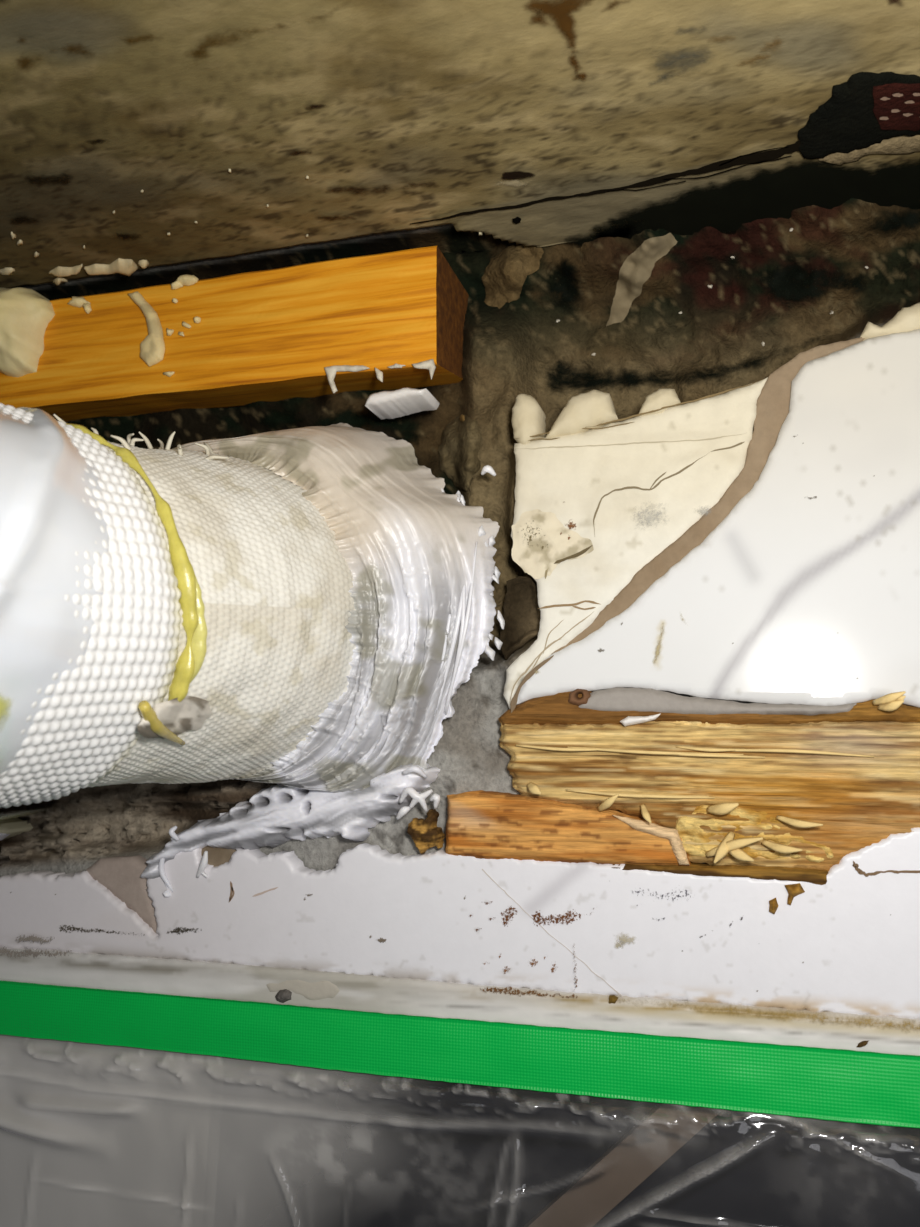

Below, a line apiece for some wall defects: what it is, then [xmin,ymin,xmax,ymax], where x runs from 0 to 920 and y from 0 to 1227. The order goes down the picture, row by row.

rust [527,0,590,80]
water stain [27,174,71,185]
water stain [330,186,389,194]
crack [411,141,801,224]
water stain [566,159,920,247]
water stain [549,261,582,307]
water stain [759,264,865,307]
water stain [548,358,766,392]
flaking render [485,509,594,661]
spalling [201,846,237,867]
spalling [85,855,157,933]